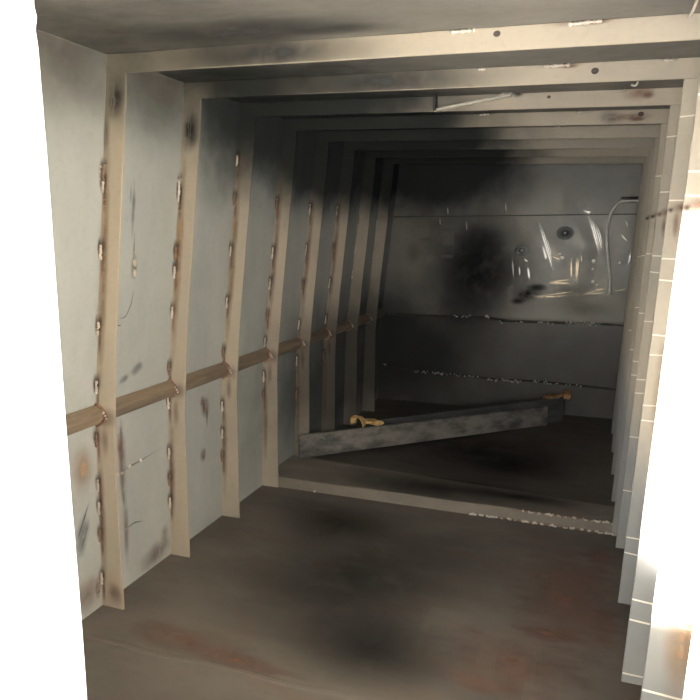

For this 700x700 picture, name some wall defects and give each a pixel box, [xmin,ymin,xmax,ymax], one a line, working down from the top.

corrosion [98,229,106,303]
corrosion [172,223,182,289]
corrosion [225,192,237,316]
corrosion [96,476,104,552]